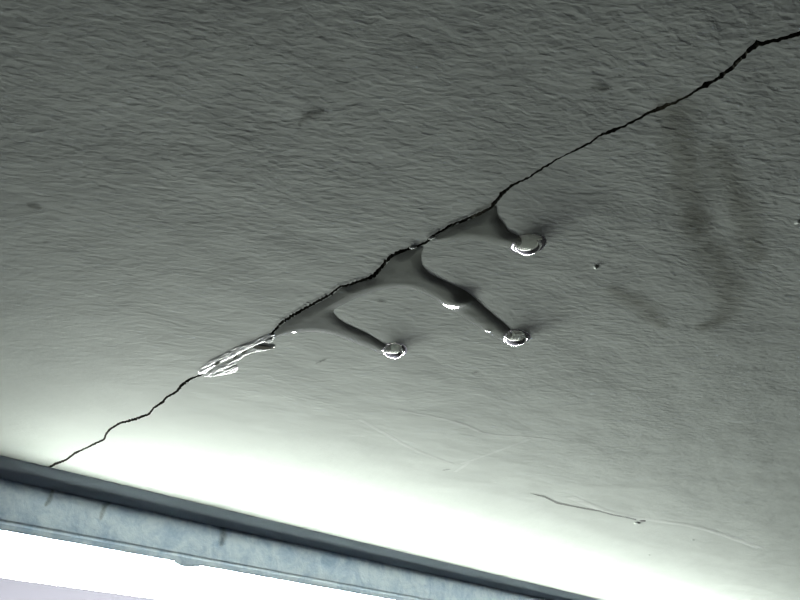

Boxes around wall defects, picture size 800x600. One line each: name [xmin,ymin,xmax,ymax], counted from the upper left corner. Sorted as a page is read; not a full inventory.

damp [432,206,546,256]
crack [269,31,800,334]
damp [273,246,531,359]
crack [50,374,203,468]